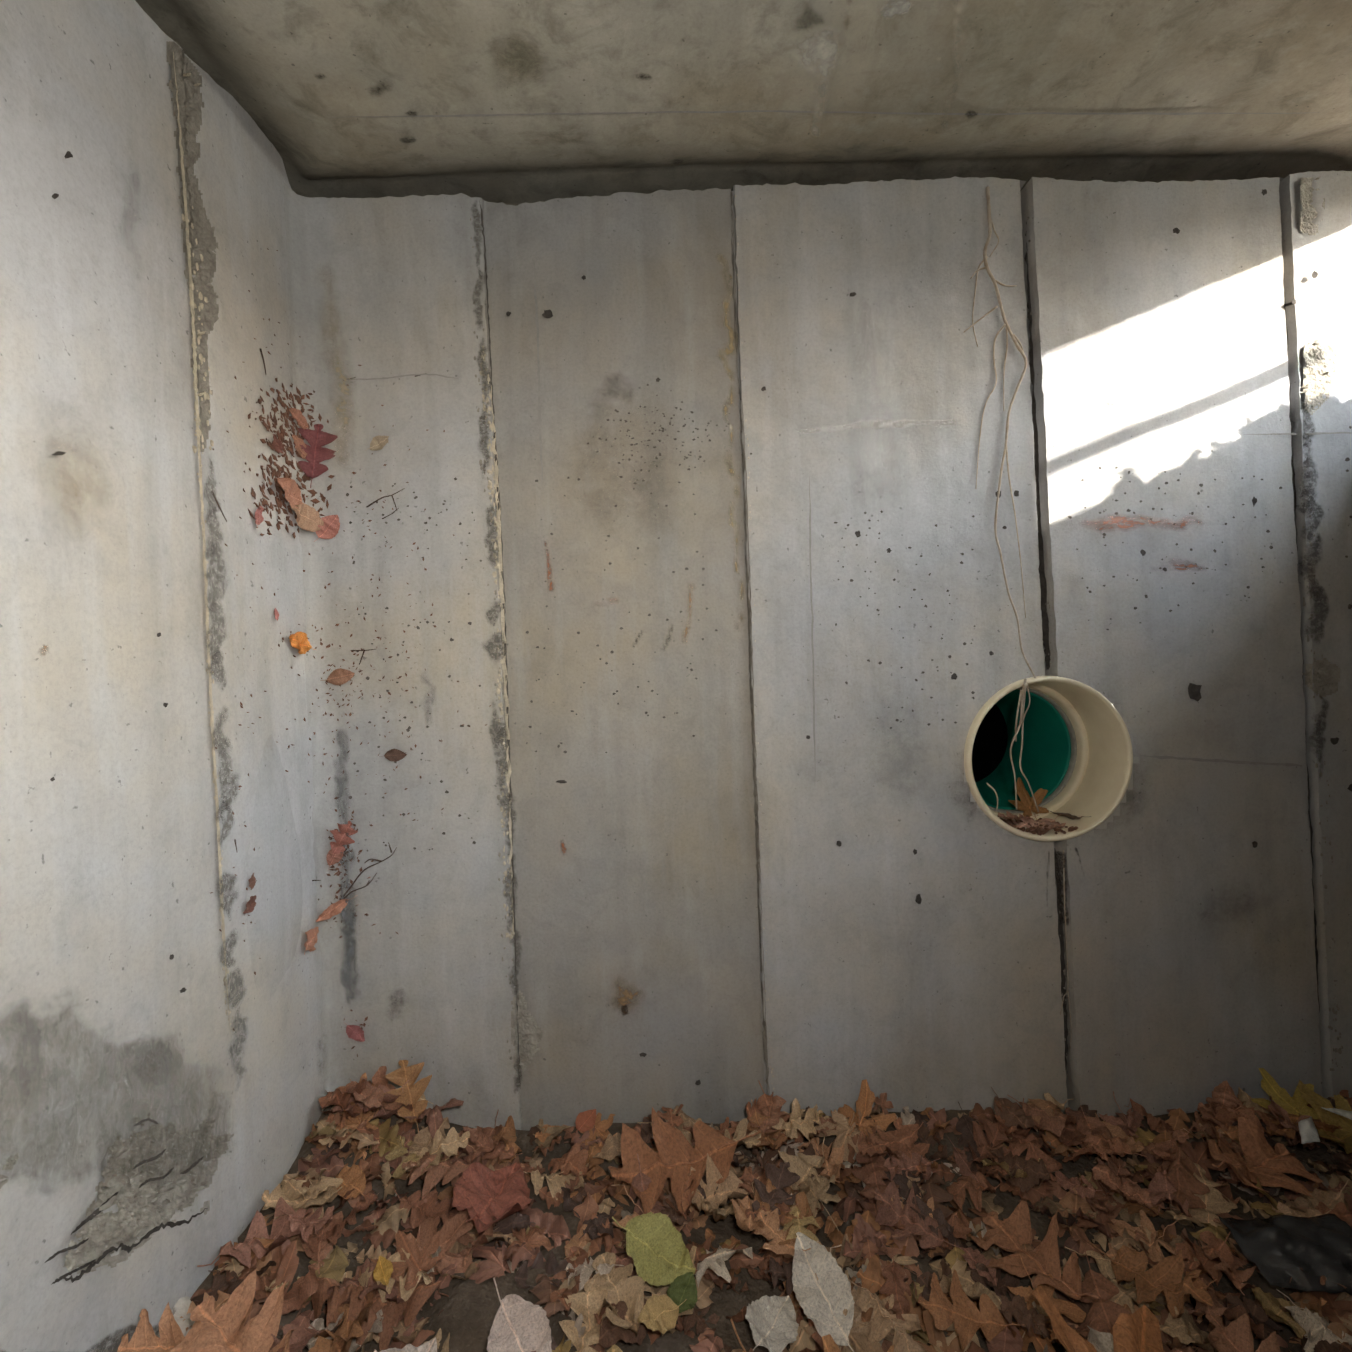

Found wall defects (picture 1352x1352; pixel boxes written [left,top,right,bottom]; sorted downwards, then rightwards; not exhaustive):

rust [1098,516,1200,530]
spalling [45,1114,234,1285]